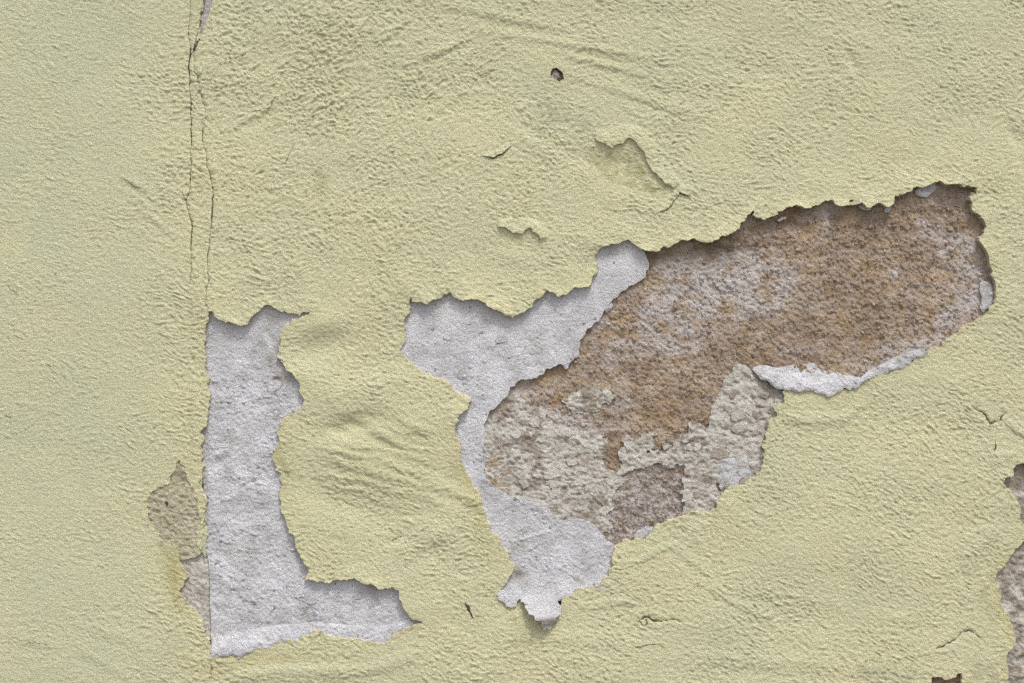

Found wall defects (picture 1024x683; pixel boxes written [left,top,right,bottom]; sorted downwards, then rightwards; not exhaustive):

flaking render [550,68,563,82]
crack [182,0,214,307]
peeling [594,123,694,217]
peeling [400,182,994,630]
peeling [147,305,421,659]
flaking render [1003,463,1024,524]
flaking render [990,541,1024,683]